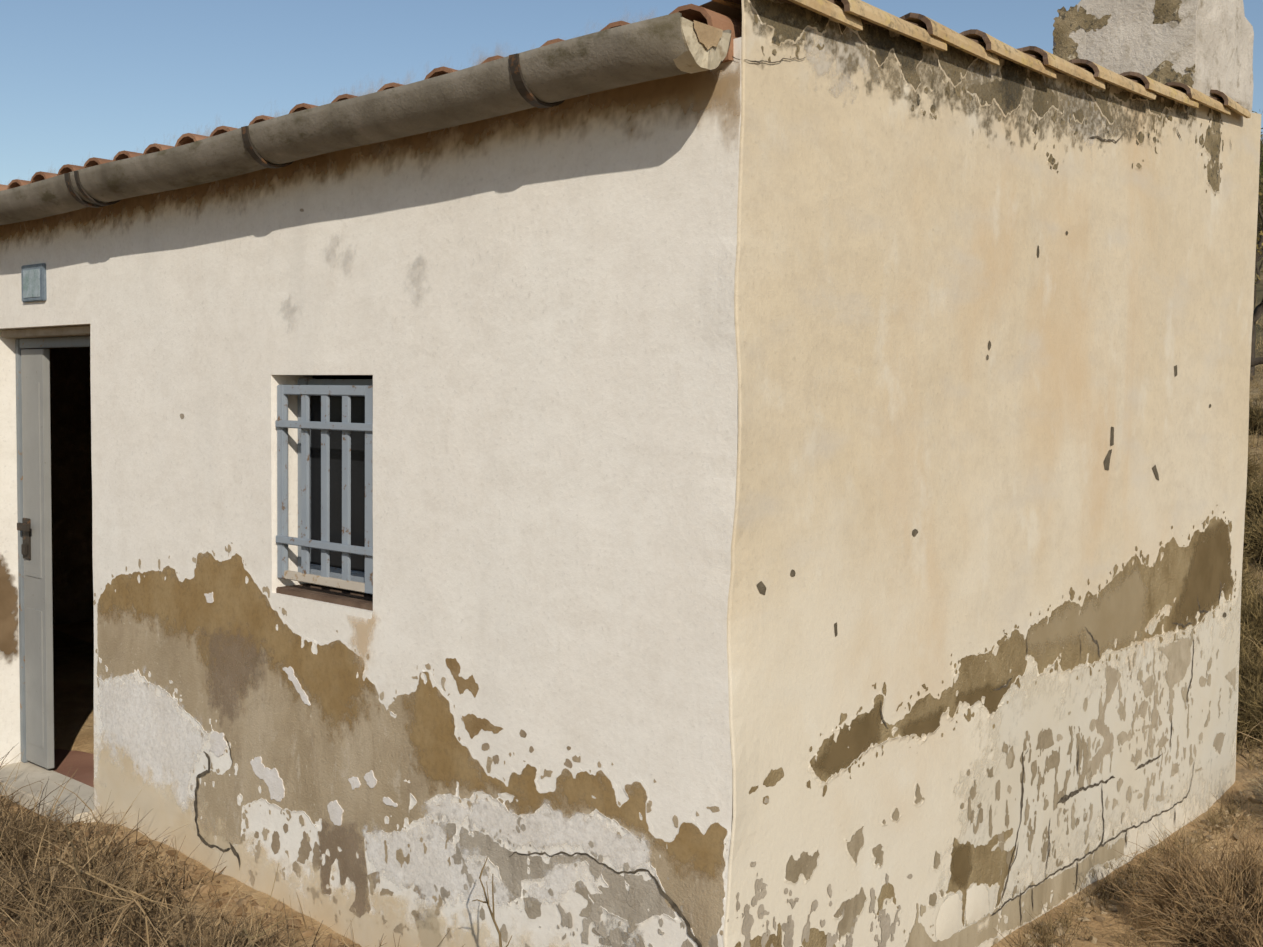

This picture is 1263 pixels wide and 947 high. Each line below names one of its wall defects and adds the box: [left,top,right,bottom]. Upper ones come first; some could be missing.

water stain [0,70,740,241]
flaking render [747,0,1224,196]
crack [194,737,240,870]
crack [509,851,702,947]
flaking render [93,510,1241,947]
crack [990,582,1222,920]